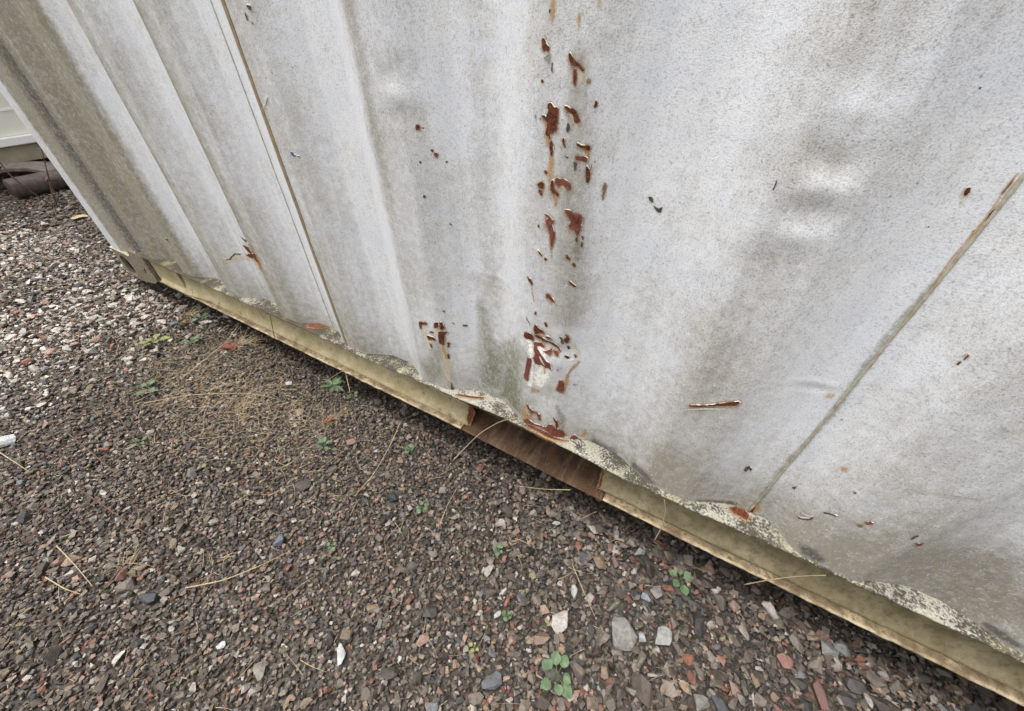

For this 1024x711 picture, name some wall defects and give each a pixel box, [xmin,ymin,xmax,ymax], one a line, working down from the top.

peeling [541,37,553,83]
peeling [568,52,591,86]
peeling [535,101,596,261]
peeling [524,276,580,393]
corrosion [729,505,757,521]